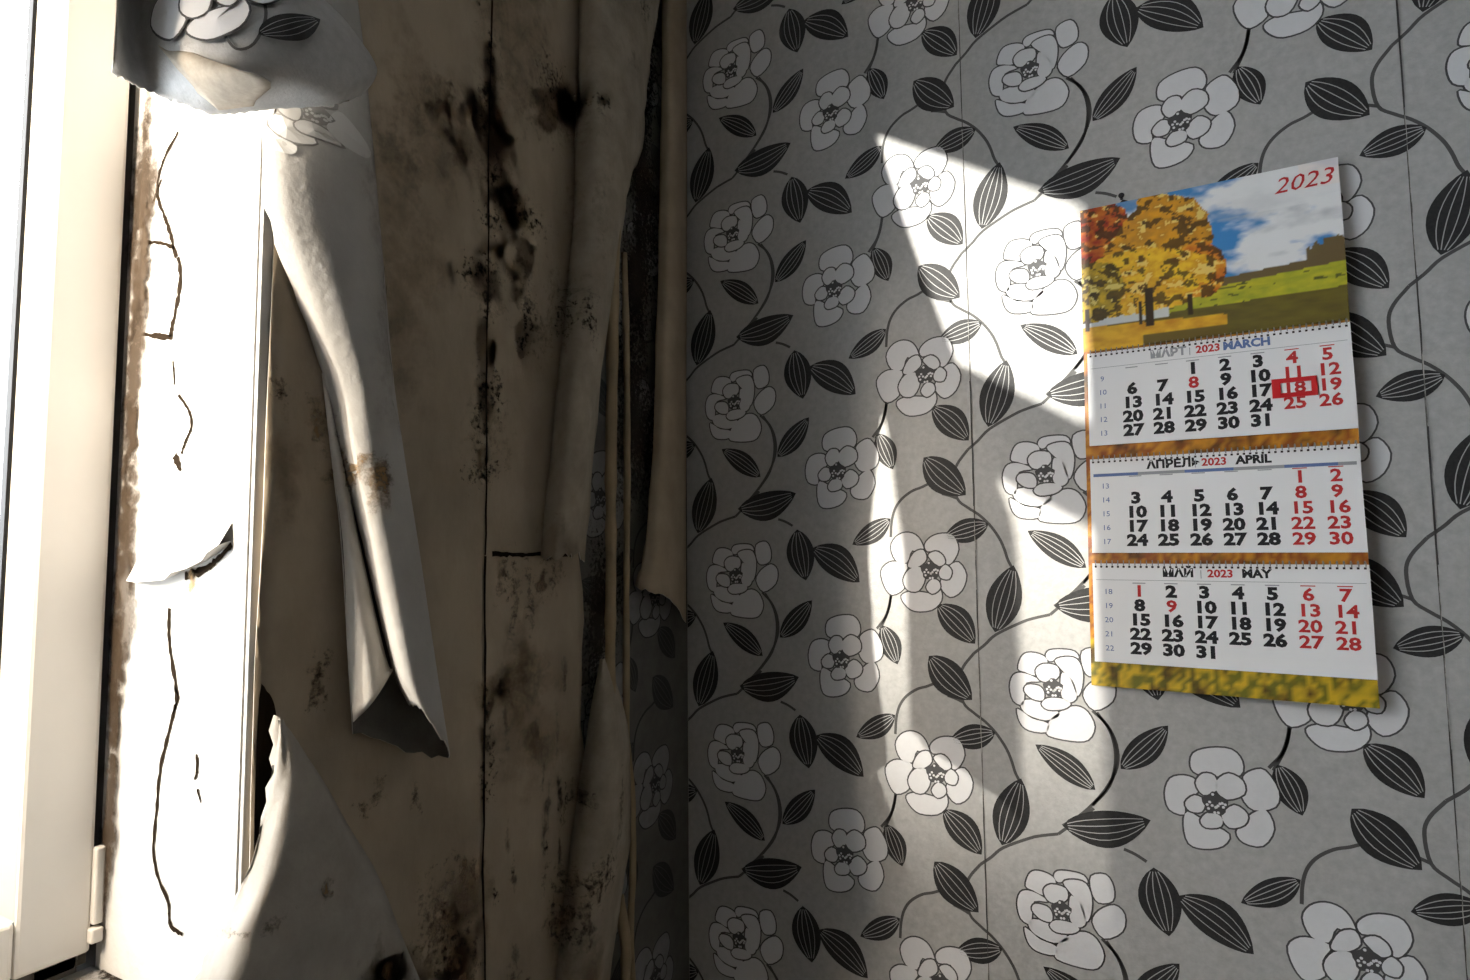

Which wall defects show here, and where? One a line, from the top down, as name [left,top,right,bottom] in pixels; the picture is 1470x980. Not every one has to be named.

leakage [616,1,662,525]
crack [152,608,201,936]
peeling [126,524,233,592]
leakage [581,527,623,727]